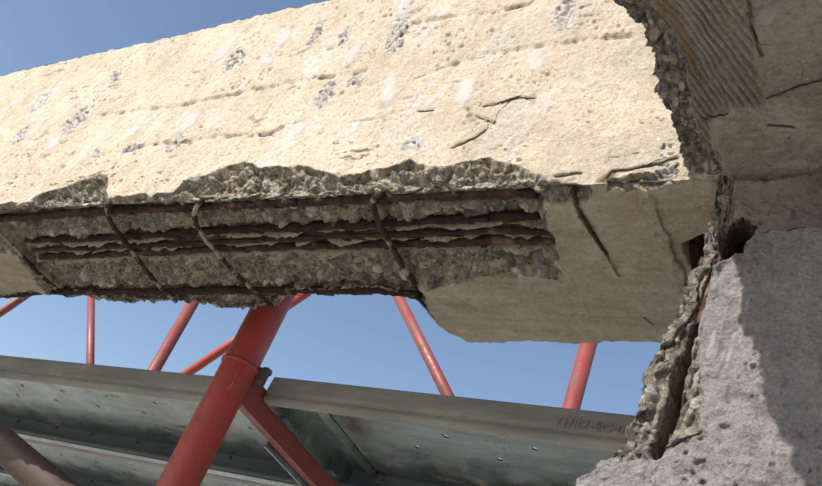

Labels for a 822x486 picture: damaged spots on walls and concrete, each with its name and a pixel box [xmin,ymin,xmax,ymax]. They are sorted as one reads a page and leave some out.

crack [747,0,768,57]
crack [767,69,822,99]
crack [452,95,535,149]
crack [768,122,795,130]
crack [606,156,678,180]
spalling [0,157,596,323]
corrosion [570,185,621,276]
spalling [604,0,758,463]
crack [665,432,701,450]